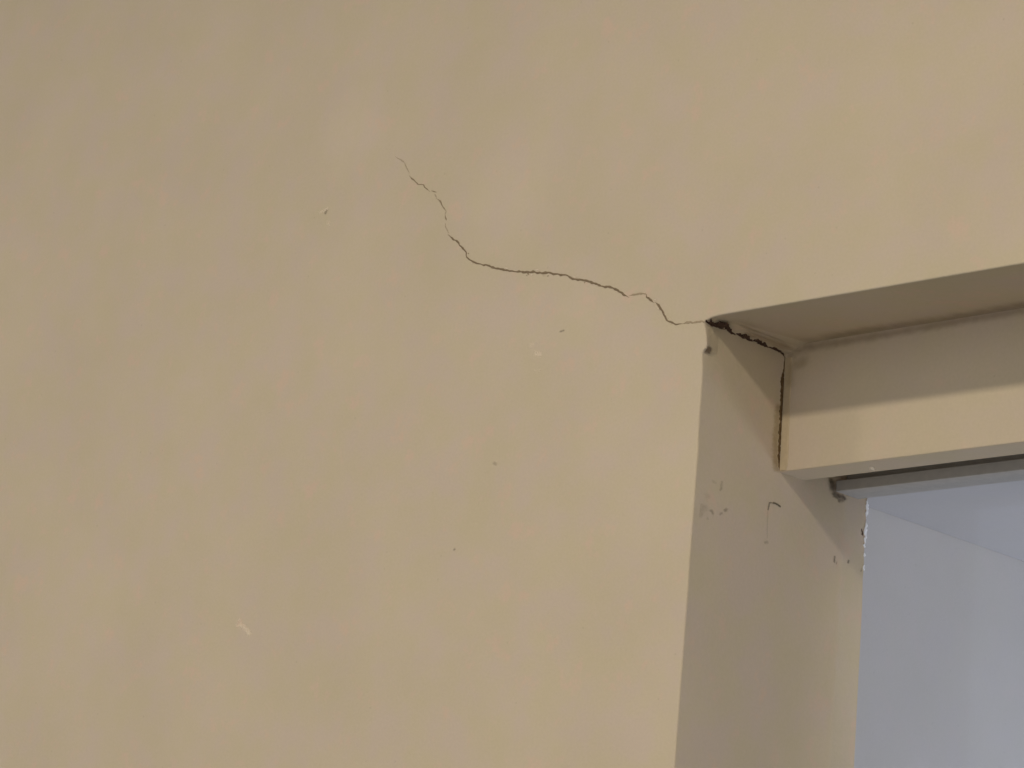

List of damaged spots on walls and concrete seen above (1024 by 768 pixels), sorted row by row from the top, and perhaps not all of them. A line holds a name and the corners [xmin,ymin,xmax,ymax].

crack [395,156,785,469]